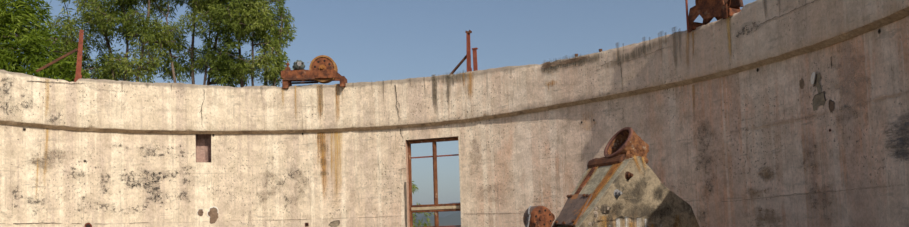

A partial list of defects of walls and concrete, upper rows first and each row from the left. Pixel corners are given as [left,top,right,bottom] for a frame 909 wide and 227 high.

leakage [544,54,599,73]
leakage [607,27,680,66]
spalling [799,72,835,113]
corrosion [317,132,340,186]
leakage [77,146,194,214]
spalling [197,206,218,224]